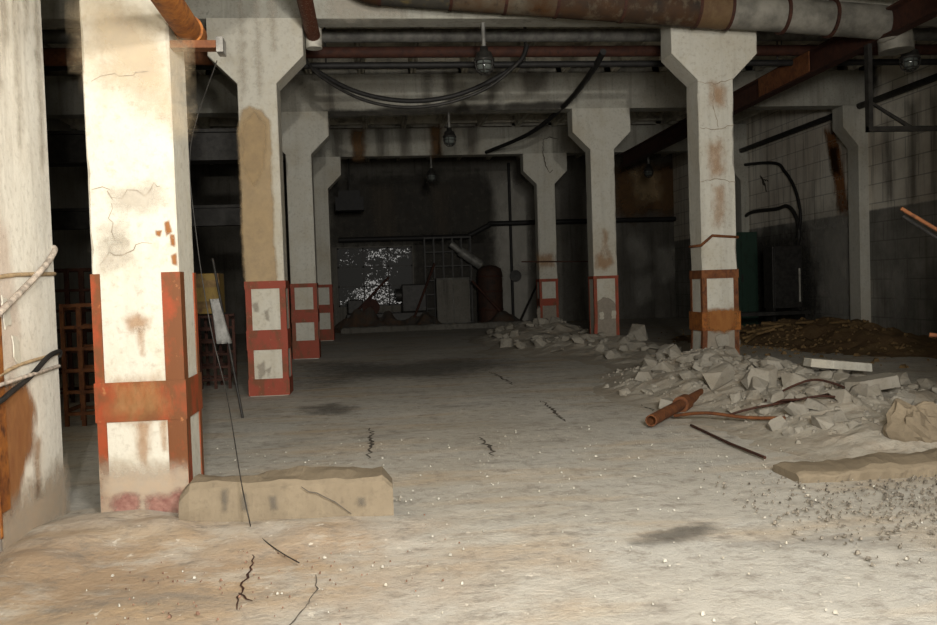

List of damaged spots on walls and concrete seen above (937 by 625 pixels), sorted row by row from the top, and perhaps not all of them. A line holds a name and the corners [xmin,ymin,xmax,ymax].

crack [366,428,375,458]
crack [236,555,255,608]
crack [289,574,319,625]